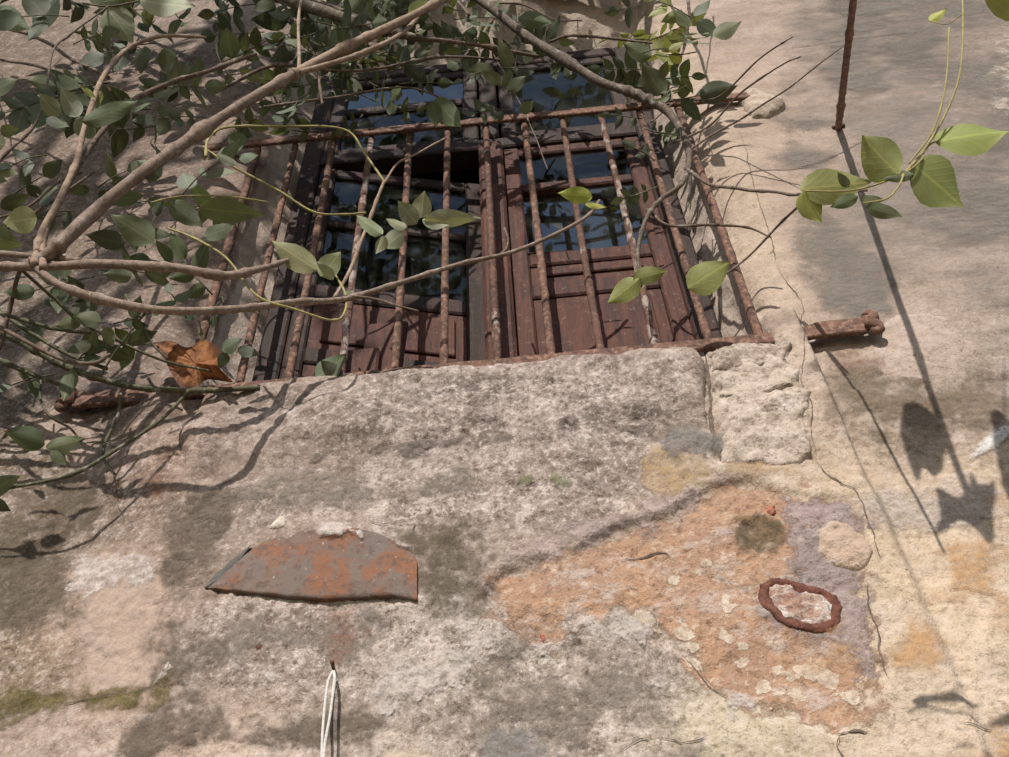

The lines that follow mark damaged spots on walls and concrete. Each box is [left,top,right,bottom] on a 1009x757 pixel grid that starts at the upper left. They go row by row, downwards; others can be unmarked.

crack [742,138,881,558]
crack [867,585,887,675]